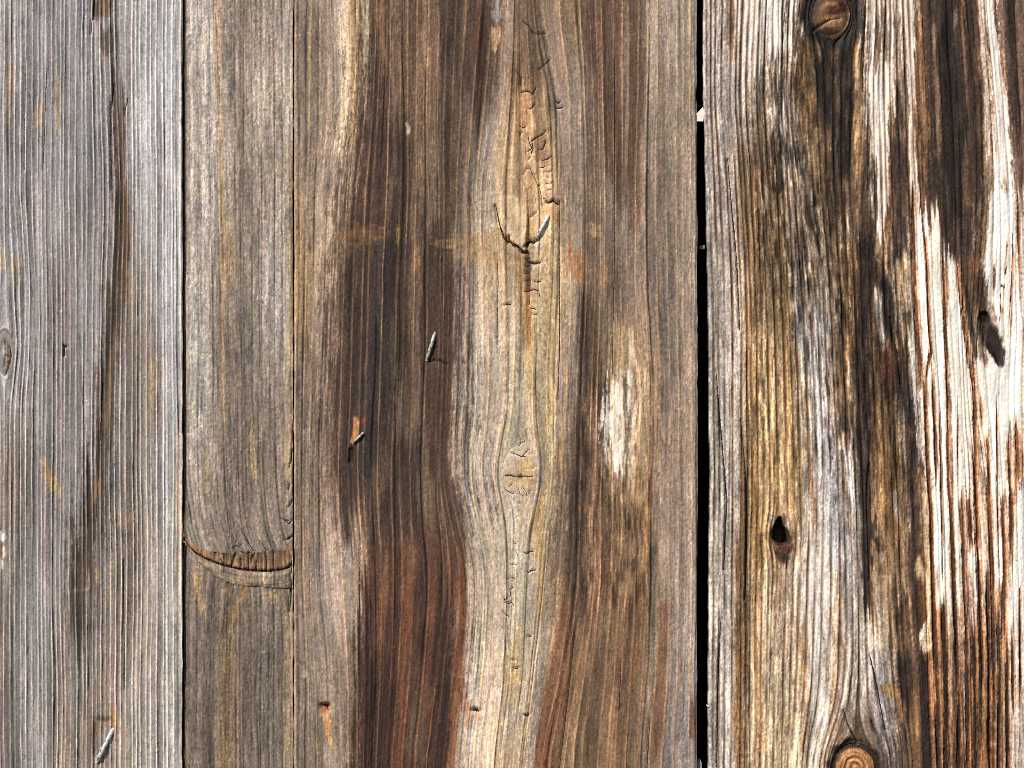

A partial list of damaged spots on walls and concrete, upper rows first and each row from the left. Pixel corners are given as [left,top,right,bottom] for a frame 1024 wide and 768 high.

crack [496,60,563,395]
crack [184,450,293,612]